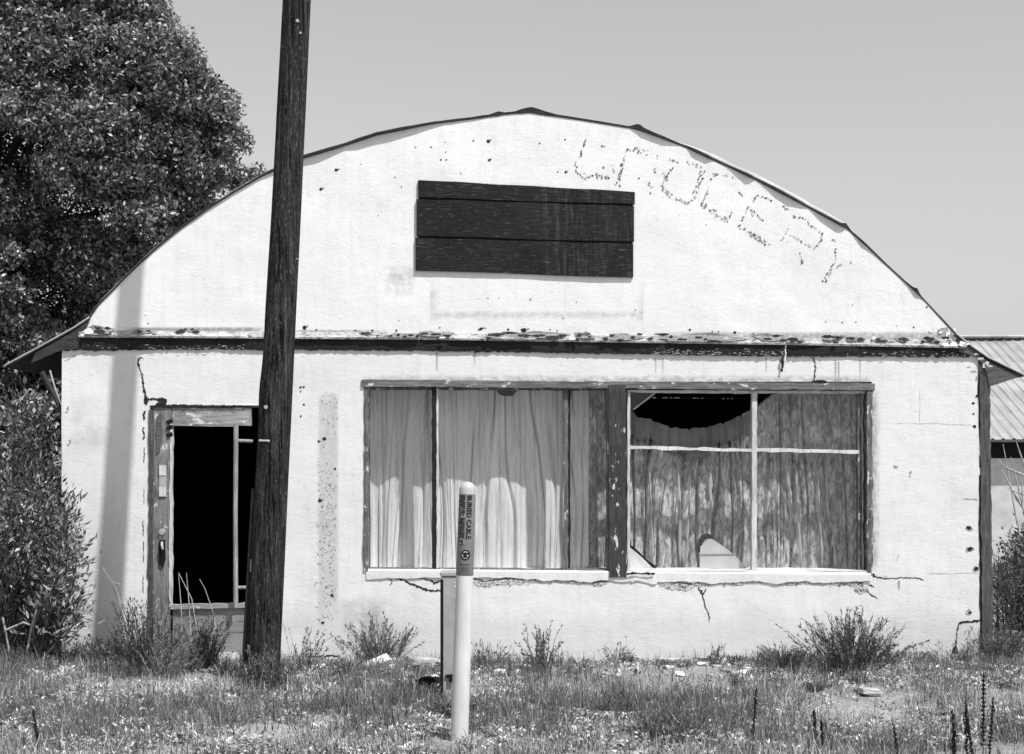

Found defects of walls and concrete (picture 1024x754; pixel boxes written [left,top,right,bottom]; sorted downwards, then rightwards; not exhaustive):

spalling [78,325,129,349]
spalling [133,328,245,350]
spalling [359,330,453,339]
spalling [483,327,805,355]
spalling [821,327,993,368]
crack [137,357,251,462]
crack [627,569,655,577]
crack [955,620,980,648]